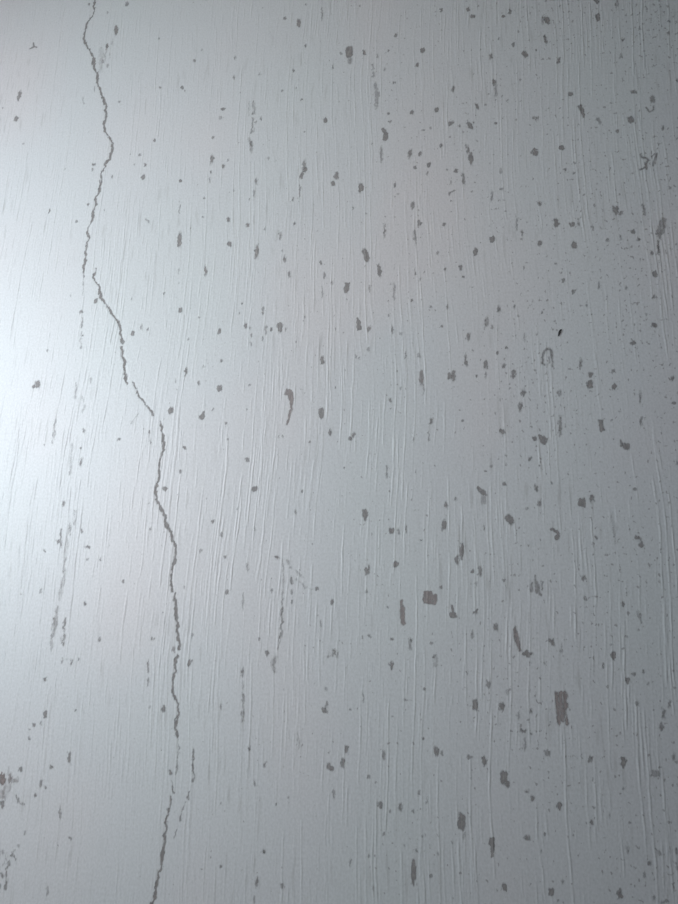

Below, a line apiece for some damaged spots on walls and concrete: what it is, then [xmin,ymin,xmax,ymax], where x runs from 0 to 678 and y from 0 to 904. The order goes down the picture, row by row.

crack [82,1,181,737]
crack [150,785,189,904]